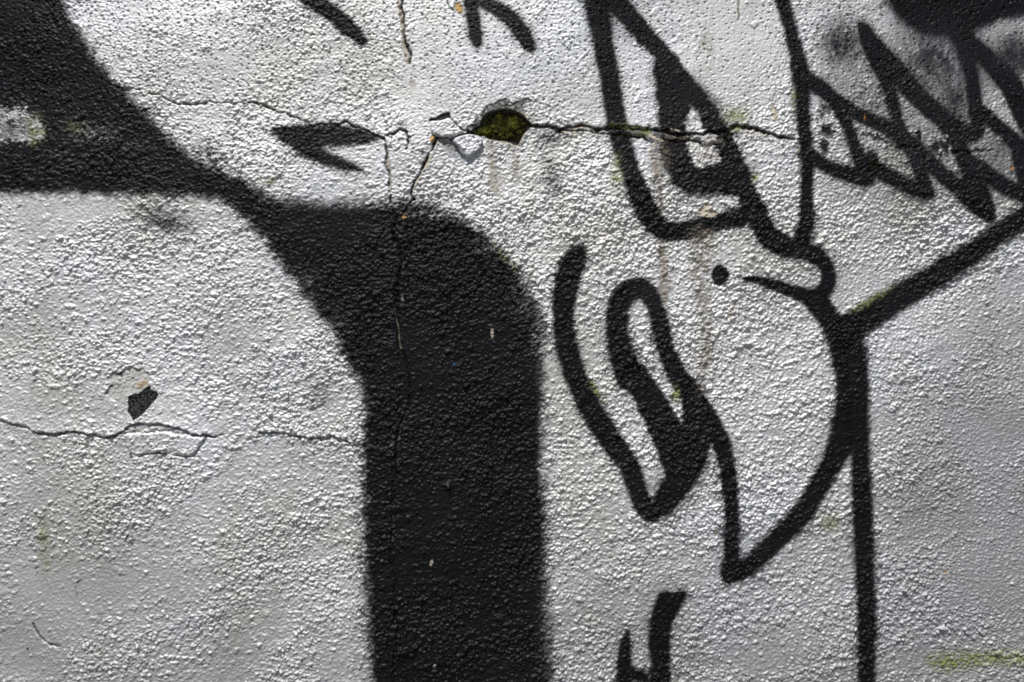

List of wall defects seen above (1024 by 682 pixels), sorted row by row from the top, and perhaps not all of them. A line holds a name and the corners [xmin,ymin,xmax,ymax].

crack [397,0,412,63]
spalling [429,97,534,147]
crack [531,123,918,150]
crack [953,147,1018,155]
spalling [105,367,158,420]
crack [142,92,452,682]